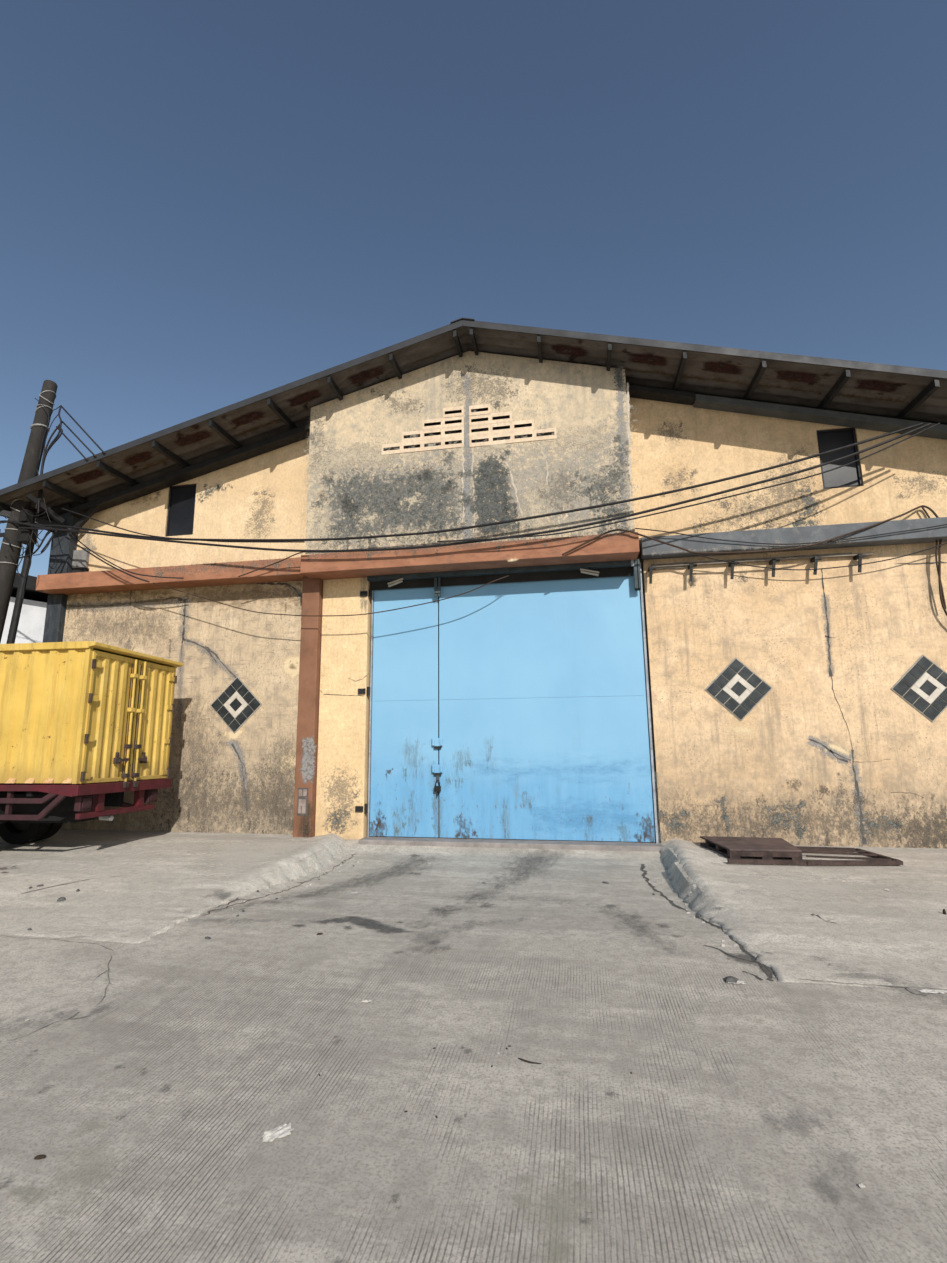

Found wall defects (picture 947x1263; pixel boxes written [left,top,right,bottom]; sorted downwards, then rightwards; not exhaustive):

rust [547,340,590,365]
rust [620,349,741,383]
rust [765,371,830,394]
rust [837,380,905,402]
damp [313,449,520,549]
damp [570,435,629,535]
crack [808,569,924,845]
damp [148,706,350,877]
damp [650,780,947,907]